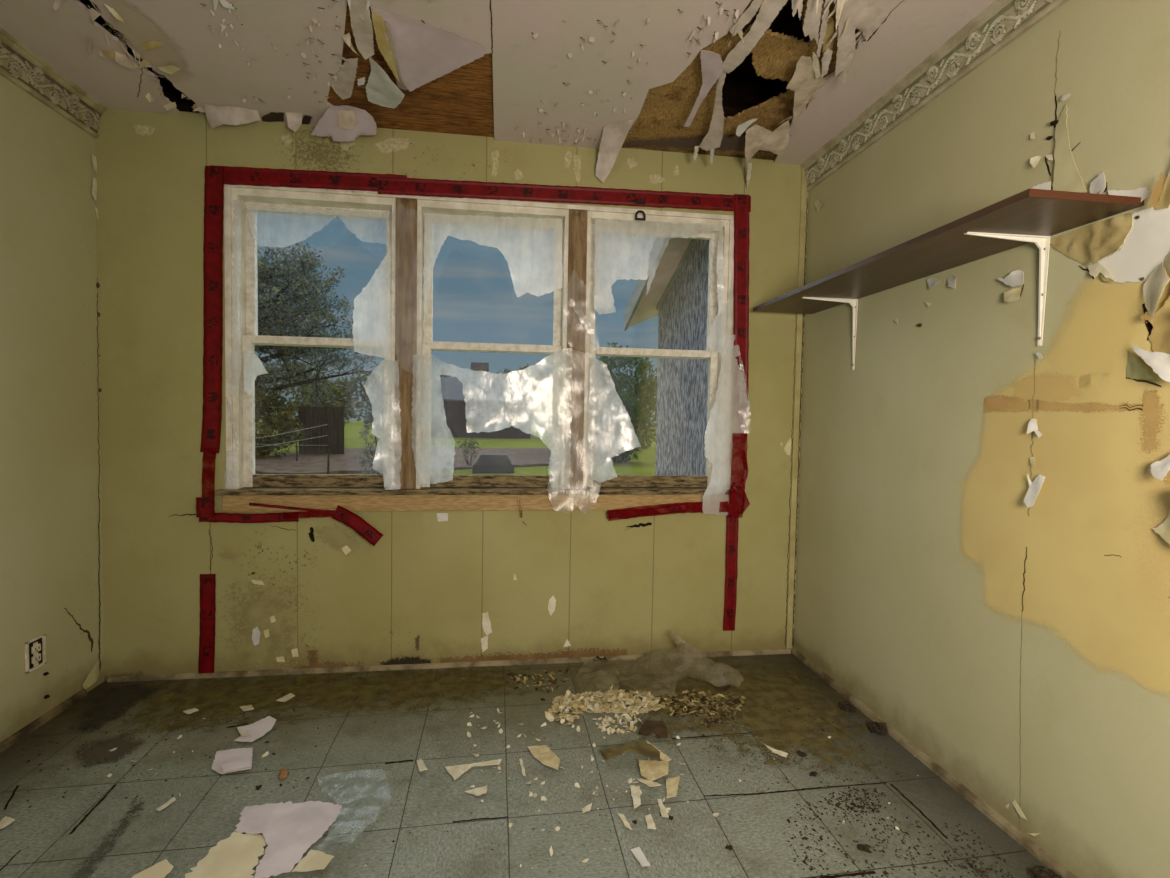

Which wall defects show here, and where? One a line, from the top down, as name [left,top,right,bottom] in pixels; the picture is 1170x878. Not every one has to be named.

crack [52,0,205,113]
peeling [203,87,312,146]
crack [487,0,495,53]
peeling [688,0,739,58]
spalling [722,53,790,117]
spalling [767,0,810,42]
crack [1030,36,1087,193]
peeling [1031,181,1051,190]
peeling [1090,171,1170,283]
peeling [998,270,1024,302]
crack [1024,353,1045,516]
crack [1019,547,1027,683]